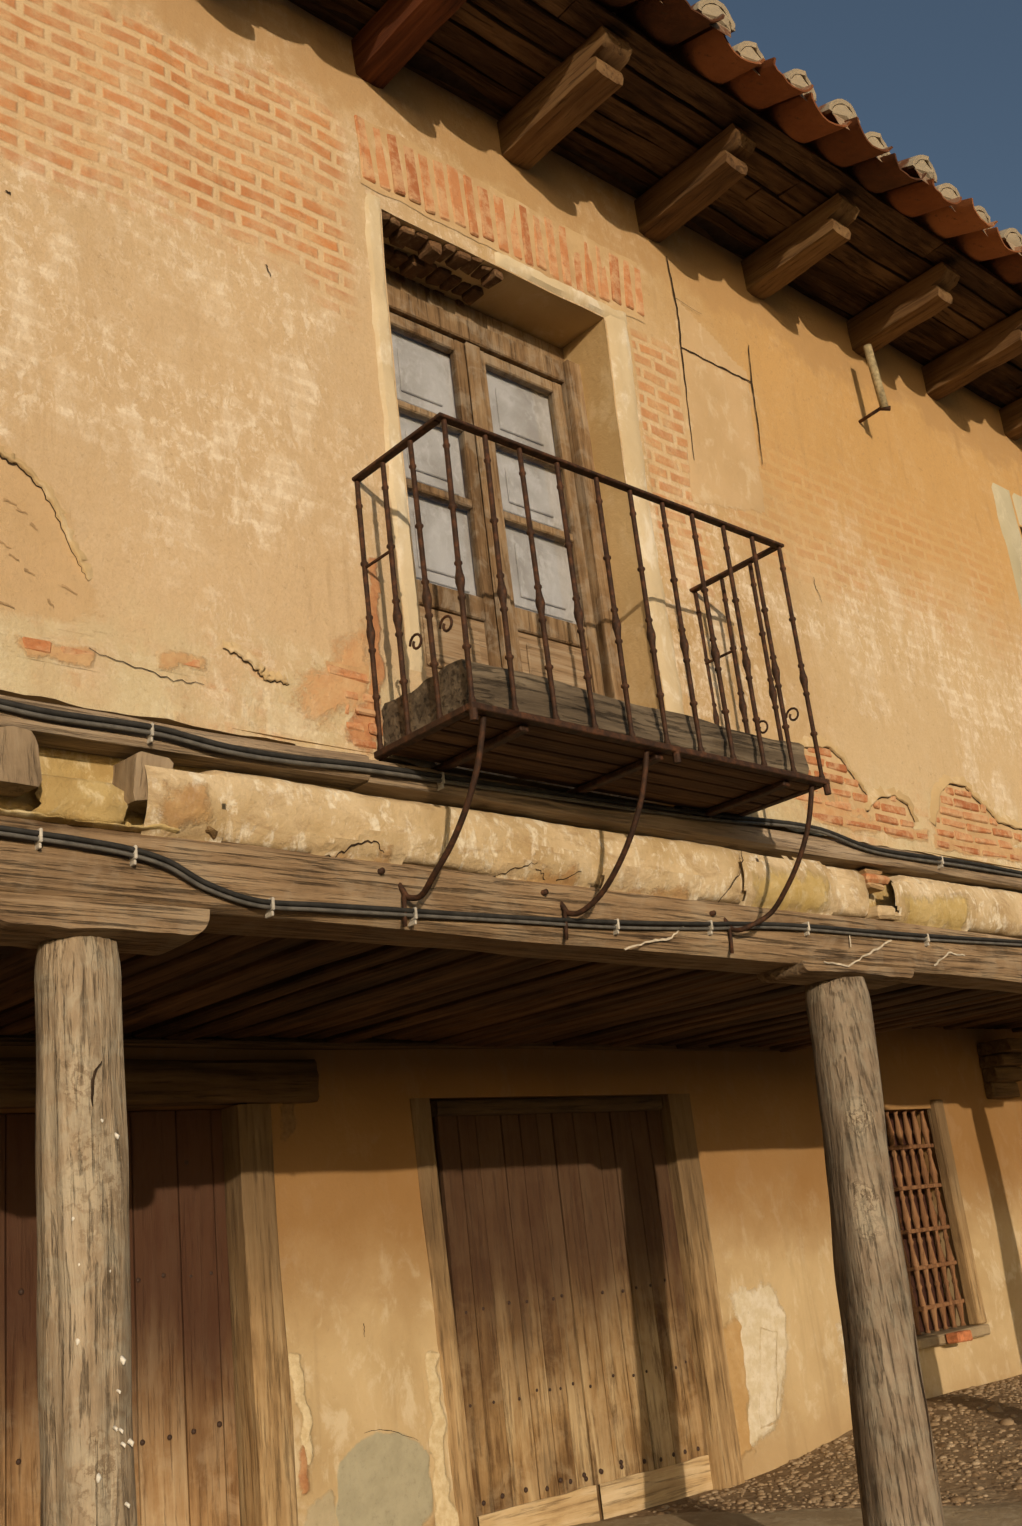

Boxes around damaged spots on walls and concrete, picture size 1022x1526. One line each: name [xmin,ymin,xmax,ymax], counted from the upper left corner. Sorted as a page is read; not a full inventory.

crack [0,445,94,581]
flaking render [7,631,101,672]
crack [90,648,202,684]
flaking render [156,646,210,677]
crack [223,639,289,686]
flaking render [326,661,369,684]
flaking render [792,735,1022,867]
flaking render [288,1347,315,1498]
flaking render [420,1347,459,1526]
peeling [722,1273,796,1450]